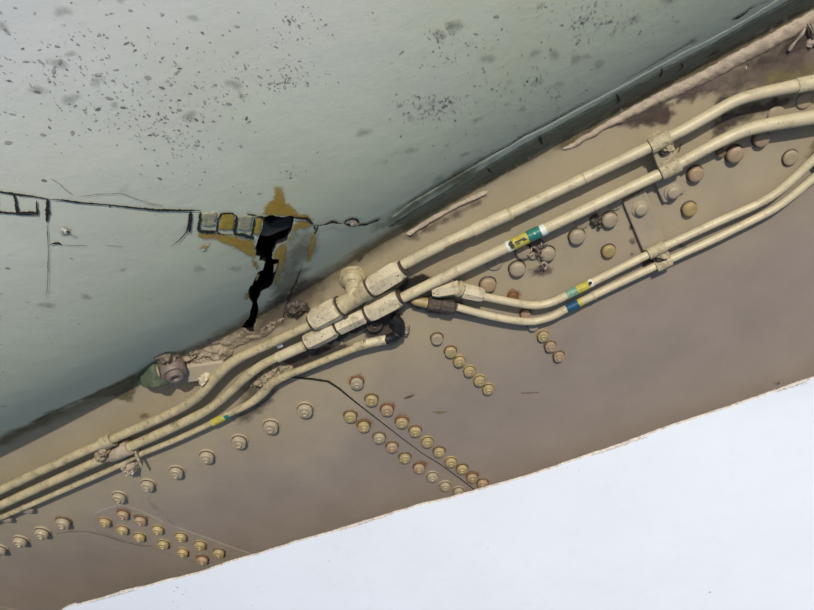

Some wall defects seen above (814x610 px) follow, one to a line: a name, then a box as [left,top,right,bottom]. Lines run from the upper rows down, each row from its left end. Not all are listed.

crack [294,37,698,234]
leakage [617,102,673,126]
leakage [677,27,814,104]
leakage [714,97,790,135]
crack [0,178,265,297]
spalling [198,187,316,326]